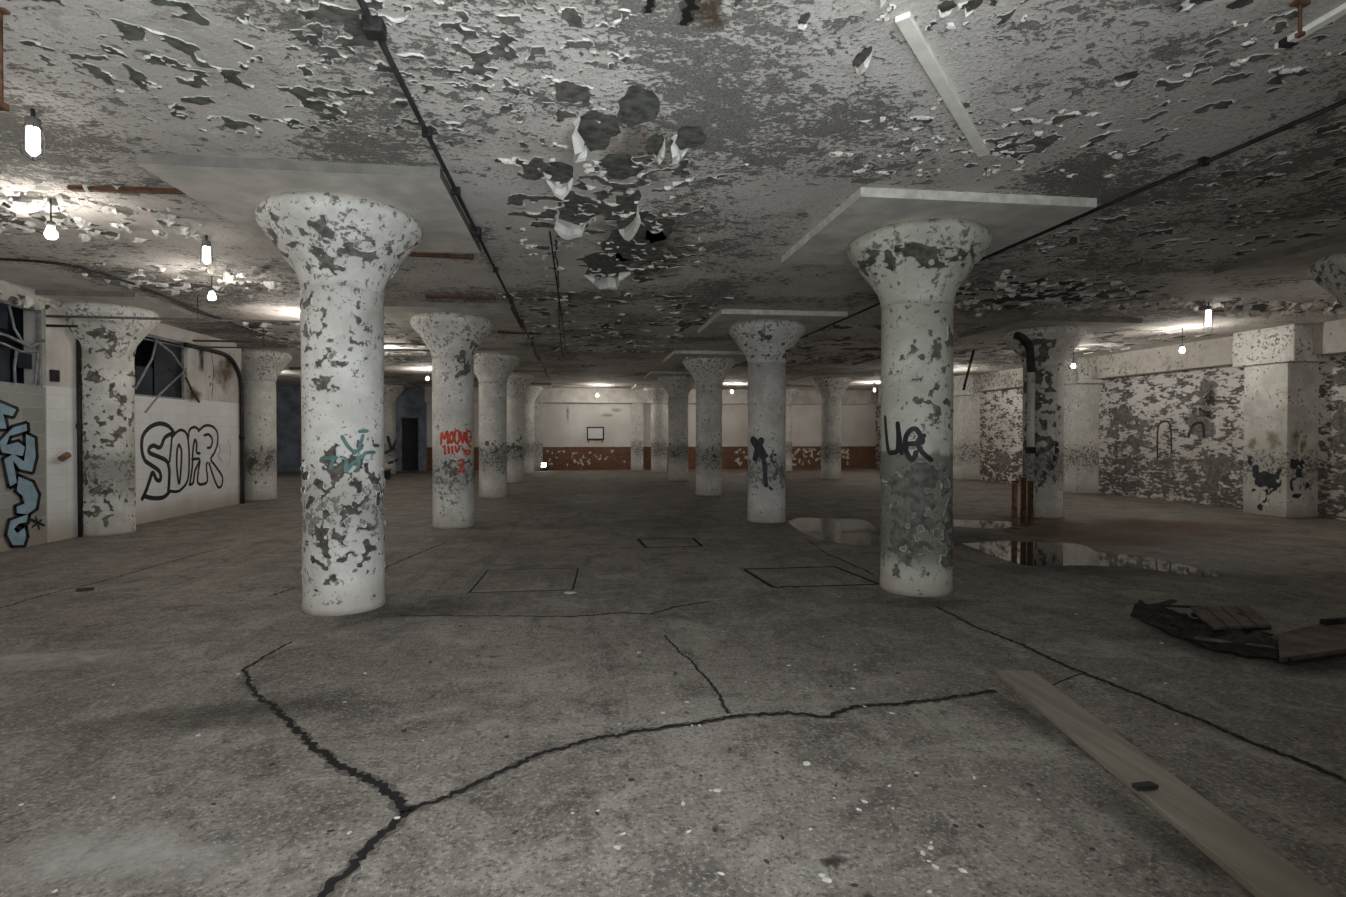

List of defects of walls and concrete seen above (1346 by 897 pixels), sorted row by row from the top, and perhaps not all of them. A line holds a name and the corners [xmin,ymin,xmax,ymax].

peeling [0,0,734,354]
peeling [797,12,810,30]
peeling [829,0,1346,181]
peeling [78,210,479,408]
peeling [732,308,881,364]
peeling [856,151,1346,511]
peeling [69,327,138,528]
peeling [300,439,386,593]
peeling [436,436,524,478]
peeling [880,461,954,580]
crack [239,601,999,897]
crack [935,606,1346,784]